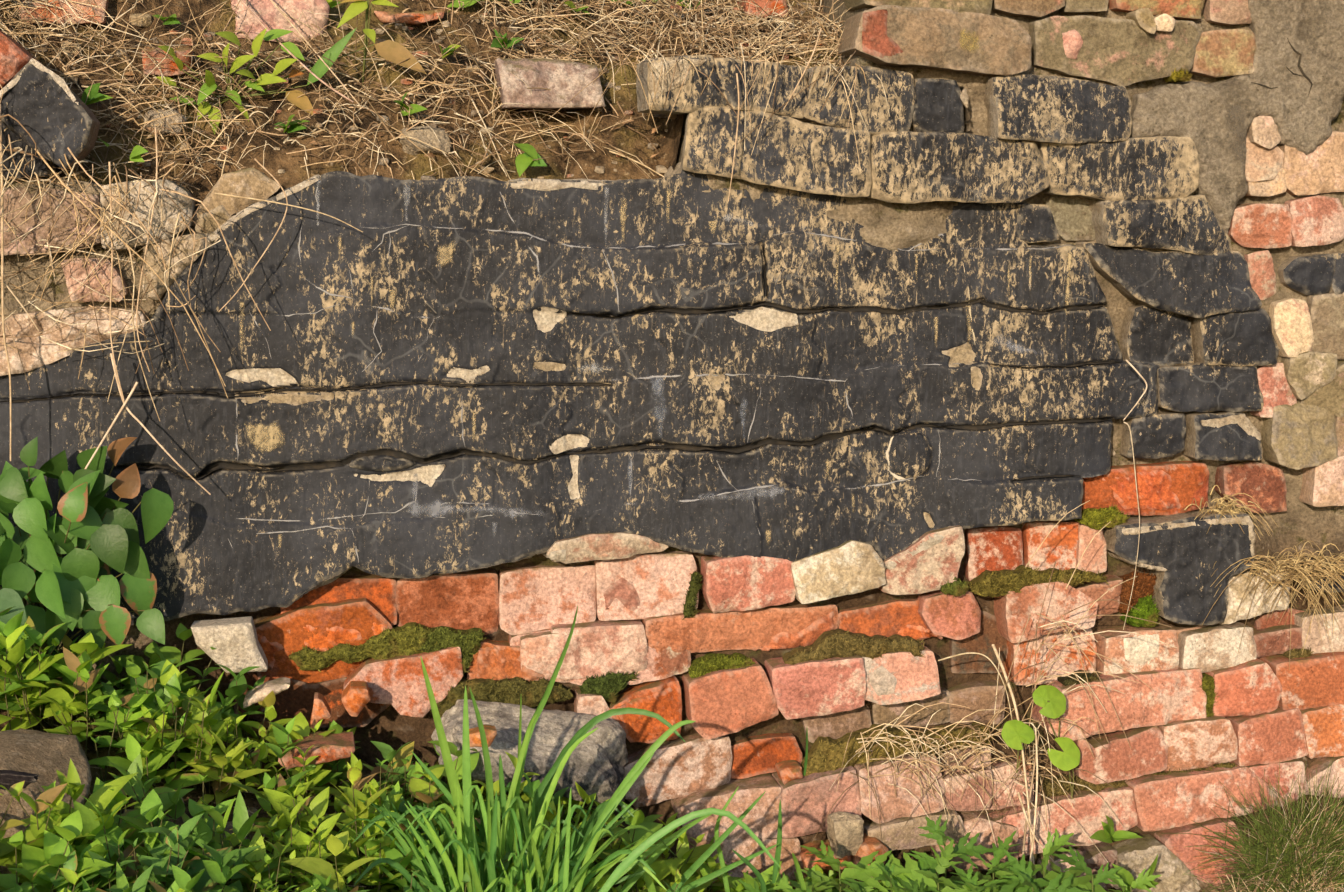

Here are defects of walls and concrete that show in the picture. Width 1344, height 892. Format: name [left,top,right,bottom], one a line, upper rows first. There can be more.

crack [1251,38,1313,93]
peeling [729,307,799,332]
crack [0,176,1122,571]
peeling [550,434,589,499]